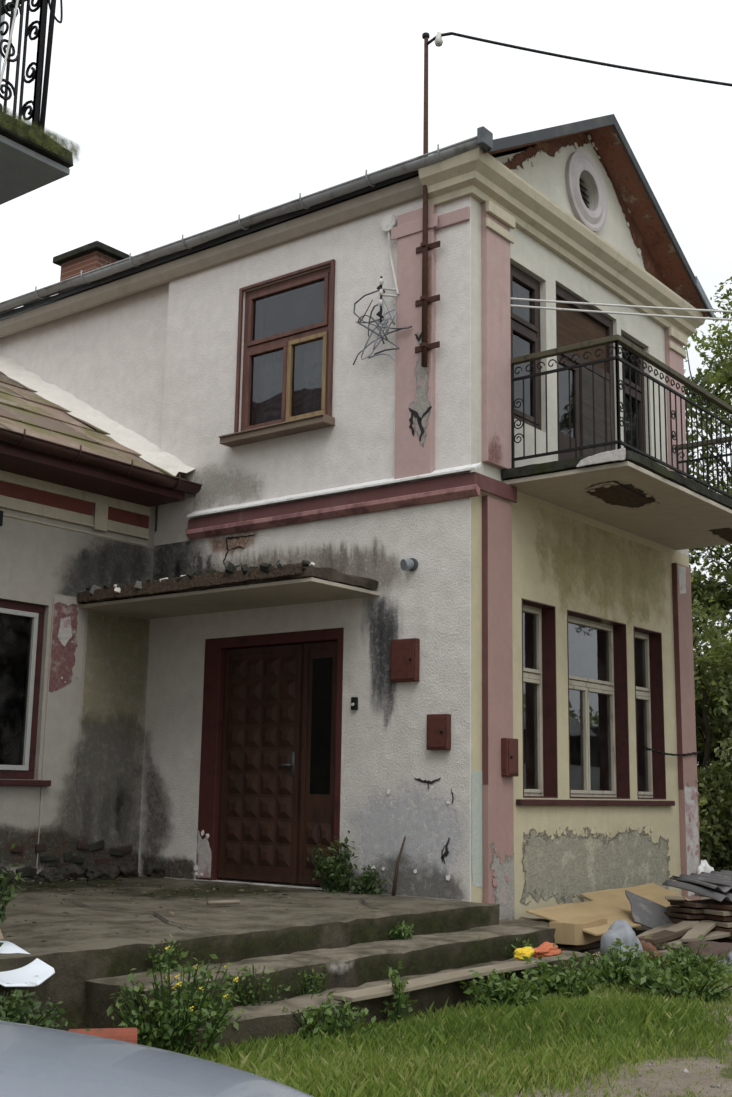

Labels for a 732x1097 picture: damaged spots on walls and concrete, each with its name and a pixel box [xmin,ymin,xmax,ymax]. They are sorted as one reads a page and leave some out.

flaking render [502,133,669,288]
flaking render [576,448,626,467]
spalling [586,481,660,511]
spalling [49,560,315,693]
water stain [62,540,398,597]
water stain [368,600,397,721]
water stain [49,718,169,864]
flaking render [471,771,670,920]
peeling [684,779,700,875]